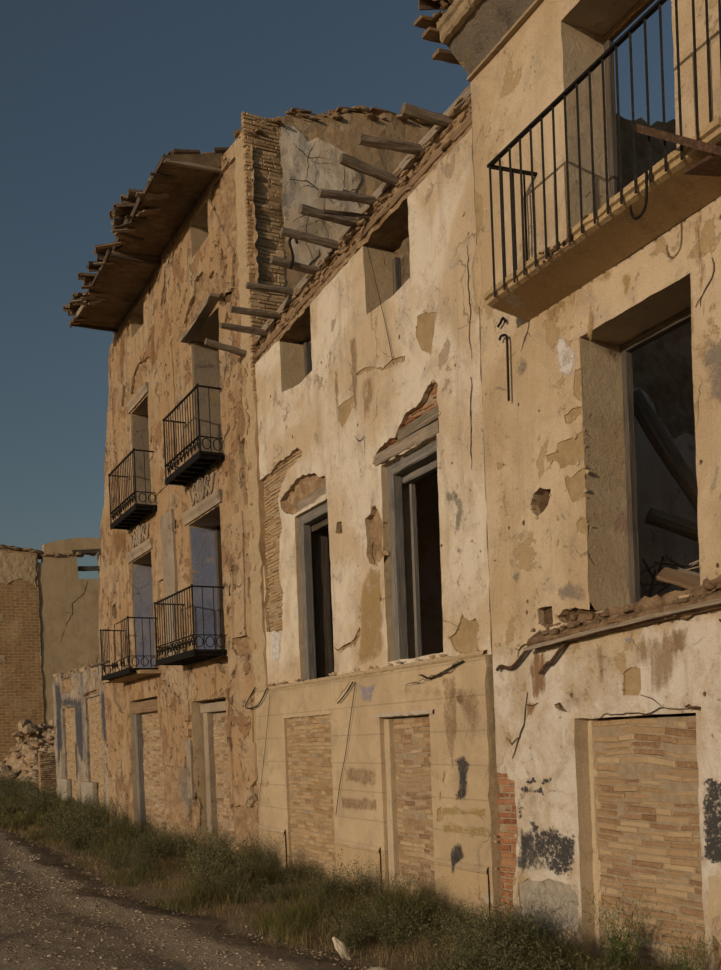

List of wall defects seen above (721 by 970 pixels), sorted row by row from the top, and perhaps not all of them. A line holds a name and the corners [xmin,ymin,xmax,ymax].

crack [290,144,359,260]
peeling [415,309,436,354]
crack [465,253,473,469]
flaking render [403,379,441,428]
flaking render [385,438,436,467]
peeling [547,367,591,502]
flaking render [263,449,326,632]
spalling [221,630,250,672]
peeling [447,616,480,653]